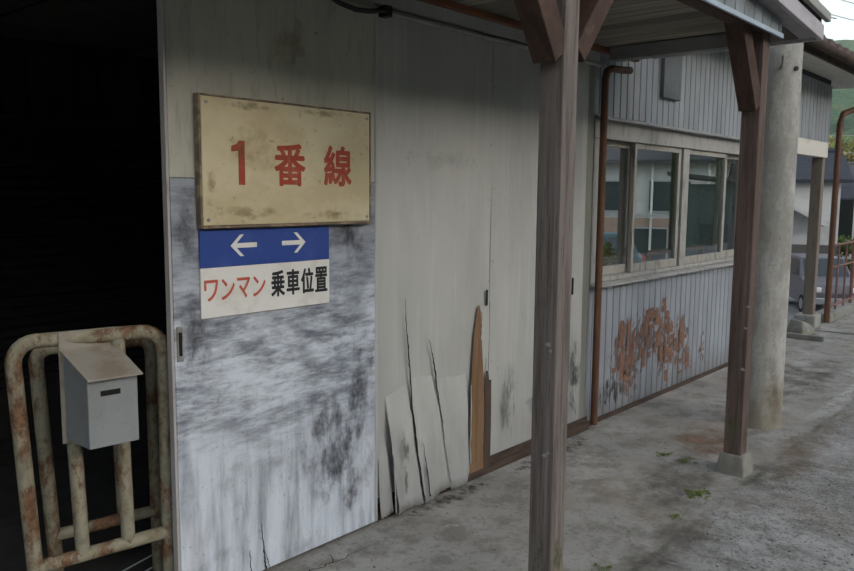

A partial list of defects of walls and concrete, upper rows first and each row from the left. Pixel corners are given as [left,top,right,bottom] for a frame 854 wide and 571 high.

water stain [315,428,360,476]
crack [389,428,399,513]
crack [405,300,451,501]
peeling [469,305,491,474]